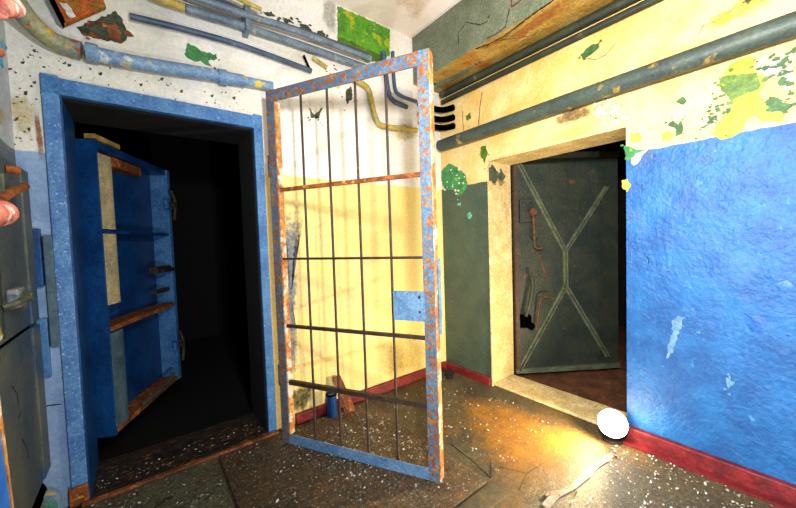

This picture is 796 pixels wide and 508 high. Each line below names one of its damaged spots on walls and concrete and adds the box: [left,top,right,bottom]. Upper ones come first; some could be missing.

peeling [0,41,49,73]
peeling [185,43,220,69]
peeling [694,46,796,140]
peeling [661,116,686,141]
peeling [441,162,472,219]
spalling [531,448,617,508]